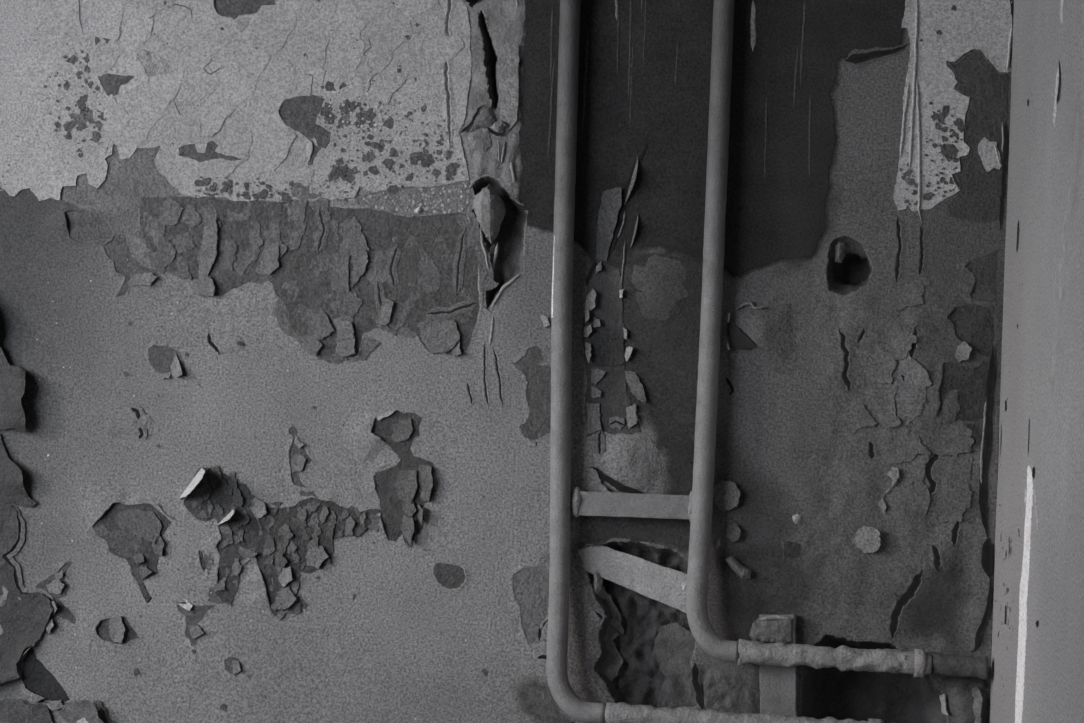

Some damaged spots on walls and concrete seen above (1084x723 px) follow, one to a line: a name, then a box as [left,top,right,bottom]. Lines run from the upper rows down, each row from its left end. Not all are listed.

crack [78,0,464,200]
peeling [898,52,1009,222]
peeling [32,397,447,655]
peeling [509,342,551,447]
spalling [819,230,876,303]
crack [837,327,868,392]
crack [864,441,880,459]
crack [899,326,922,381]
crack [885,344,995,638]
peeling [922,248,1014,430]
peeling [18,646,73,710]
flaking render [572,538,760,714]